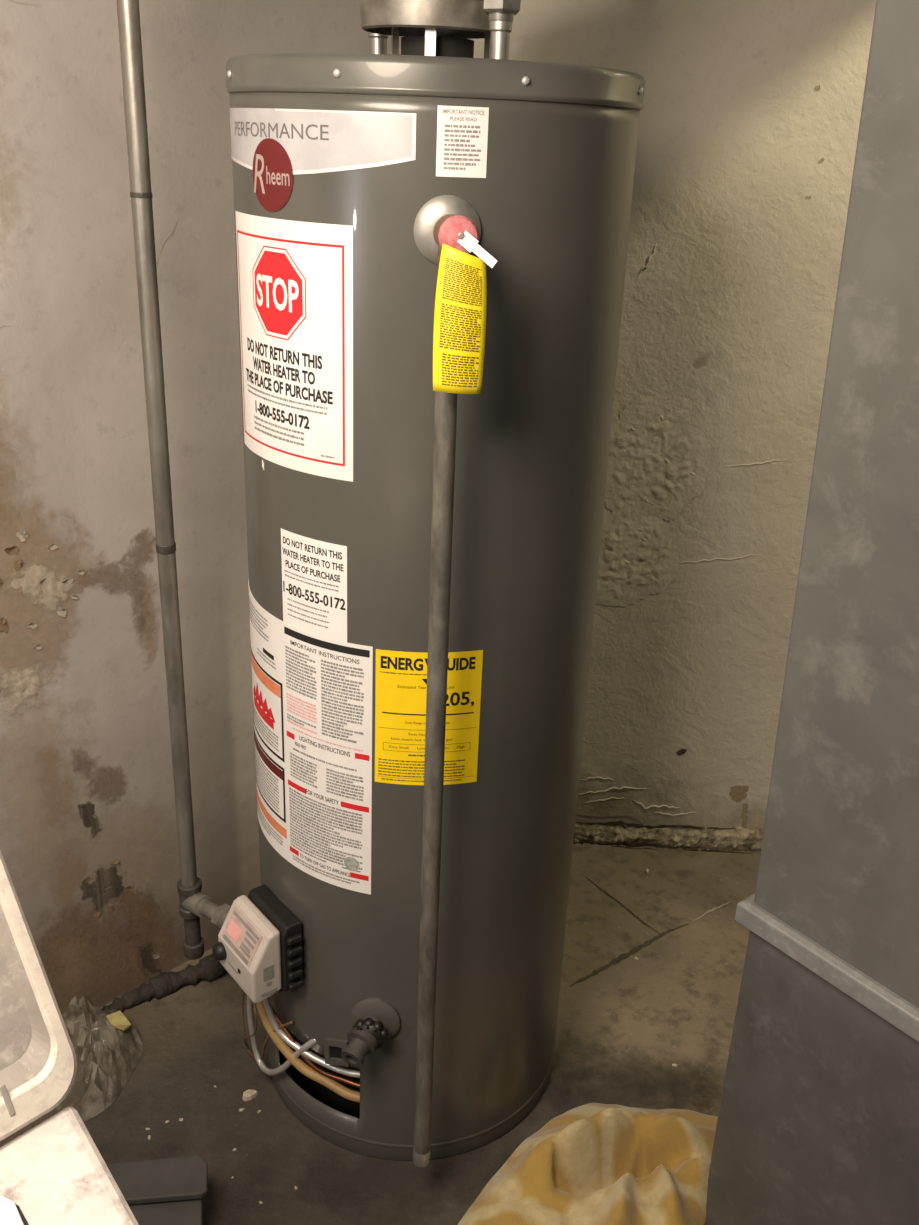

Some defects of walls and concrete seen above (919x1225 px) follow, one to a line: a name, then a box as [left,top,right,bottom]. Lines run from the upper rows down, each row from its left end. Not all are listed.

water stain [78,531,156,647]
flaking render [78,802,102,838]
flaking render [573,777,763,851]
flaking render [80,859,131,918]
crack [570,877,730,986]